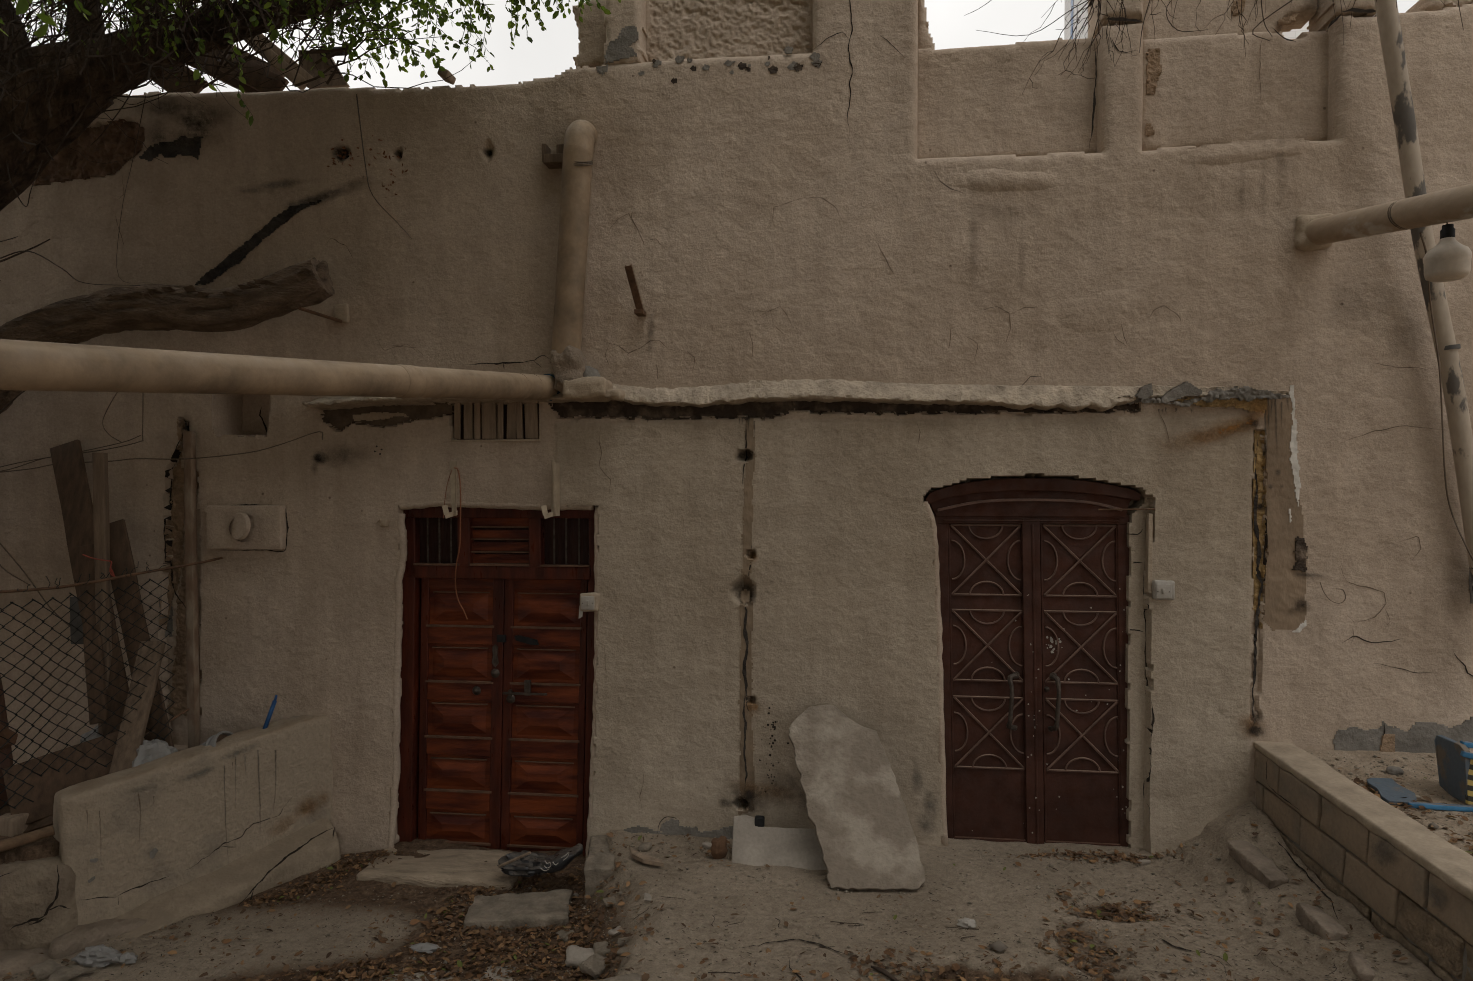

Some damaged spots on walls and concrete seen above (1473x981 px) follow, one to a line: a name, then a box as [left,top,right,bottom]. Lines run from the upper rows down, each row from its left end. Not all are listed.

crack [814,0,905,142]
spalling [32,119,203,186]
spalling [321,402,454,431]
spalling [1118,381,1290,413]
spalling [159,419,202,716]
spalling [1333,717,1473,753]
crack [10,802,288,930]
crack [239,827,335,905]